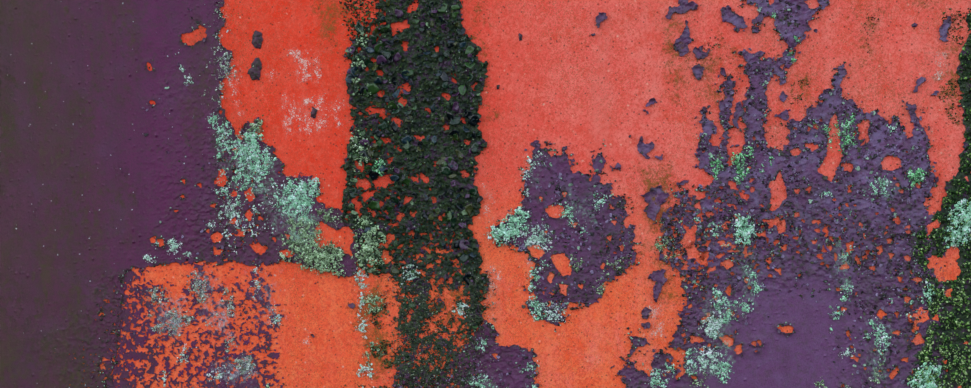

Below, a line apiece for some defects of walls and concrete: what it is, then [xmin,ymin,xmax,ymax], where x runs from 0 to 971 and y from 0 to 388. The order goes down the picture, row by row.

peeling [0,0,488,388]
peeling [491,139,643,332]
peeling [611,0,951,388]